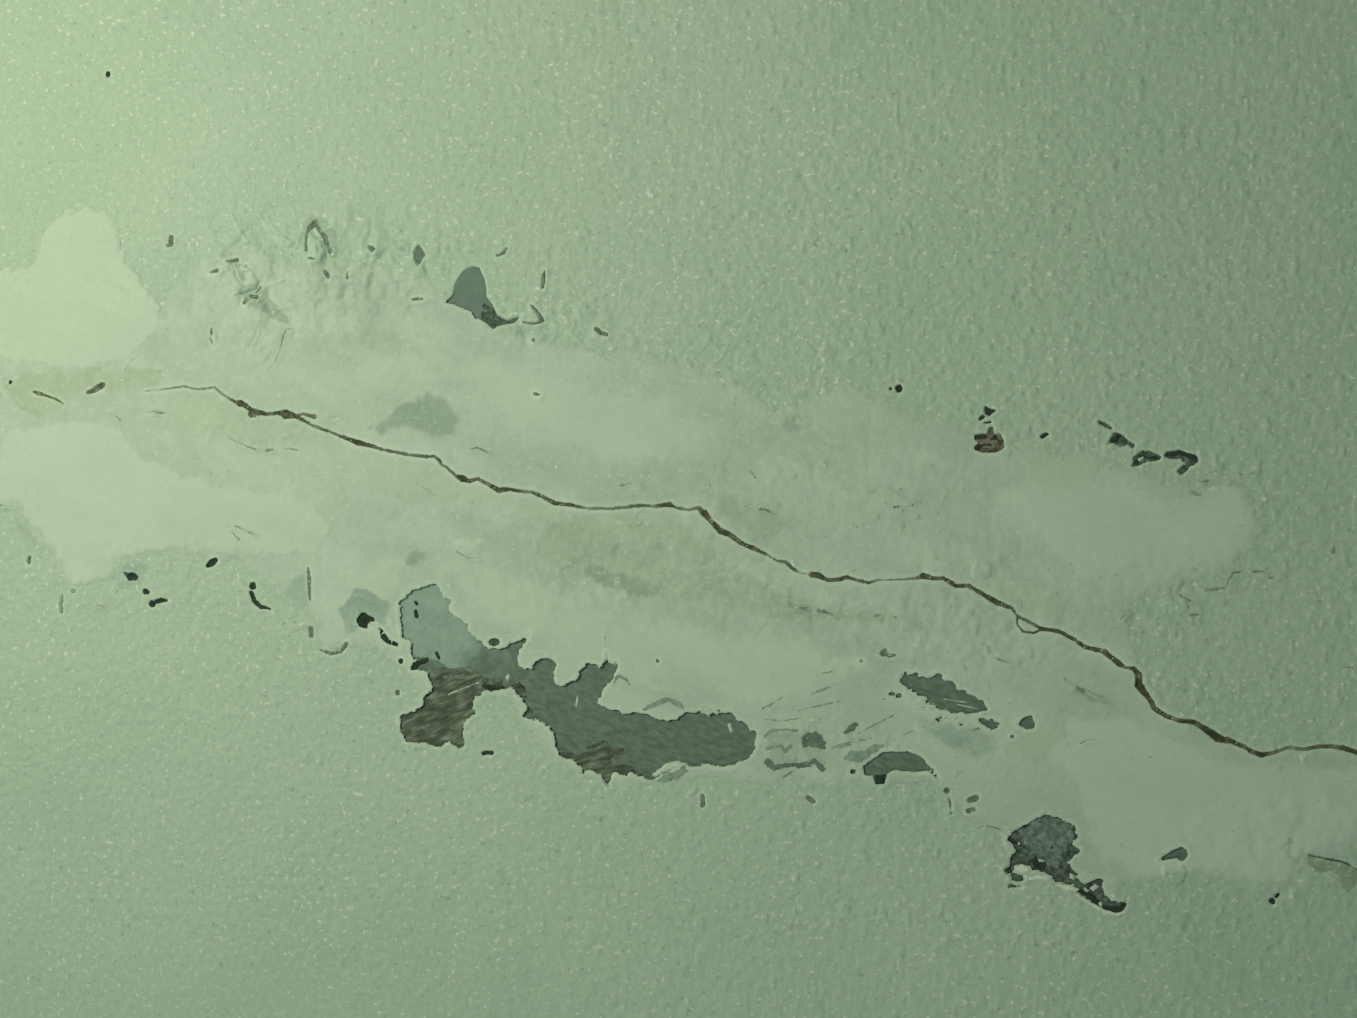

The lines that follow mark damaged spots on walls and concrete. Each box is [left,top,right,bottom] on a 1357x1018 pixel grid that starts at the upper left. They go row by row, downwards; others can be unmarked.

peeling [446,267,519,329]
spalling [1098,421,1198,474]
crack [33,352,1357,758]
peeling [357,584,1035,814]
peeling [1004,815,1127,916]